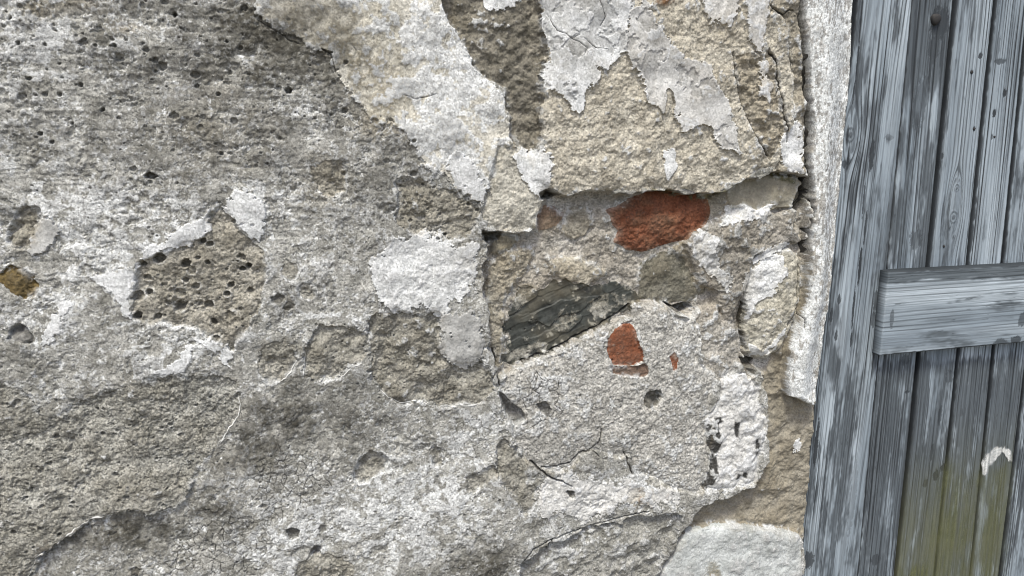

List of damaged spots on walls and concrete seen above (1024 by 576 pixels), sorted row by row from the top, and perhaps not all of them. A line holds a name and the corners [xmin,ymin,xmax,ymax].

flaking render [0,187,269,576]
peeling [253,0,816,541]
crack [531,433,601,486]